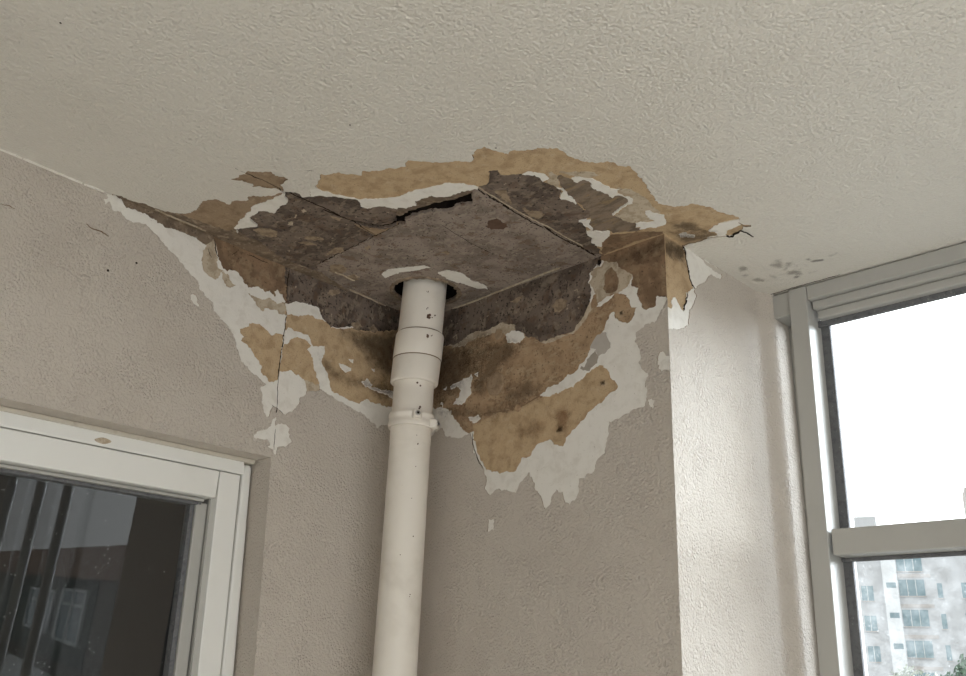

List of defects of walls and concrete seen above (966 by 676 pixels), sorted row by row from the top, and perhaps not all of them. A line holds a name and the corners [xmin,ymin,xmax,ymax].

crack [272,273,289,443]
damp [353,333,396,373]
peeling [104,147,754,508]